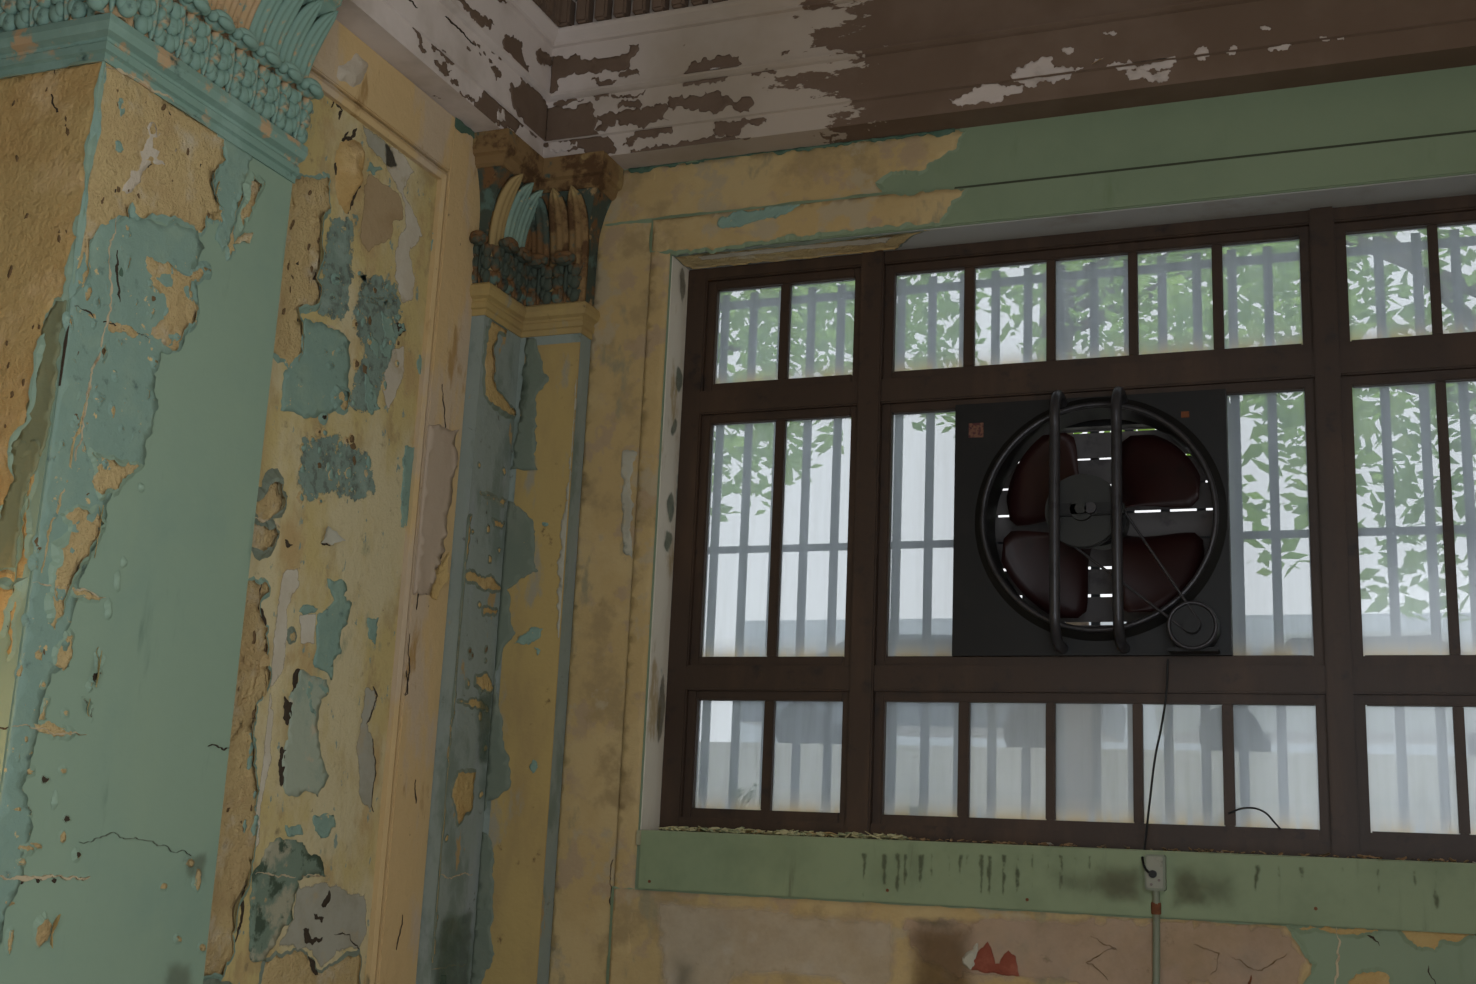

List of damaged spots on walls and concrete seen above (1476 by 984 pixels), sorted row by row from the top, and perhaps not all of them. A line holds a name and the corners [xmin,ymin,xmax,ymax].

crack [0,832,191,884]
flaking render [173,126,433,984]
leakage [918,935,964,984]
flaking render [412,0,1476,984]